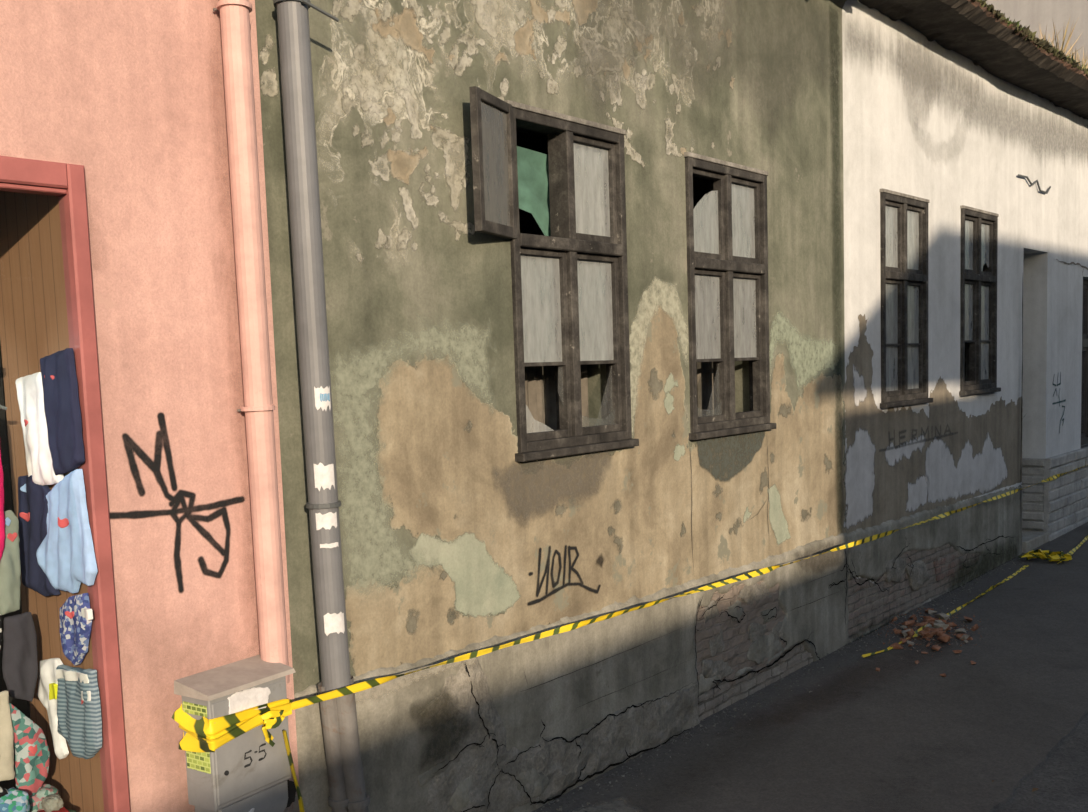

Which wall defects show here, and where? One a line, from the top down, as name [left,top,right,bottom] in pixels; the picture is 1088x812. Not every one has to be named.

peeling [341,60,475,251]
peeling [332,0,501,76]
peeling [494,0,659,168]
peeling [665,74,693,157]
crack [1056,259,1088,276]
peeling [345,304,1023,676]
flaking render [520,581,813,808]
crack [439,538,914,812]